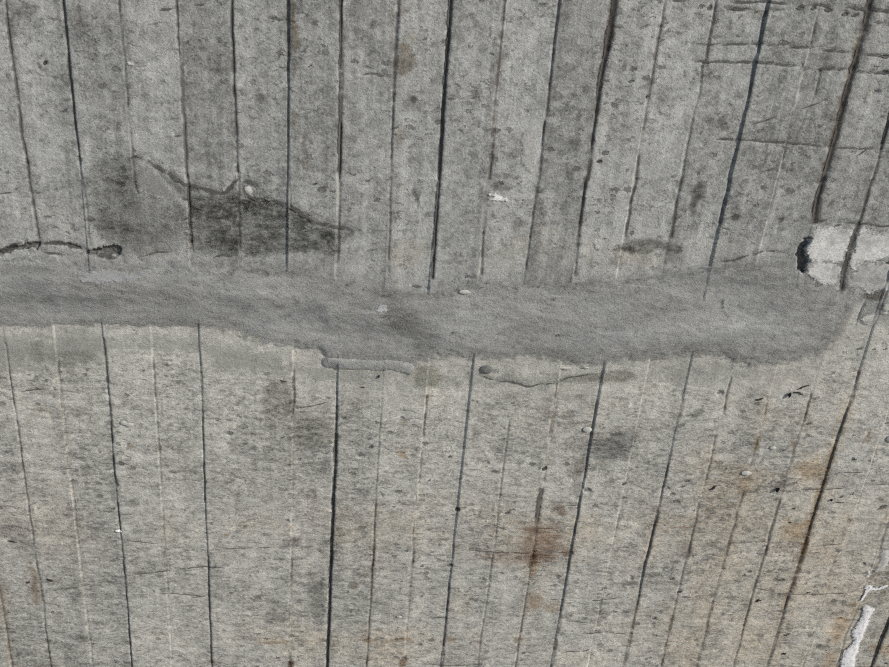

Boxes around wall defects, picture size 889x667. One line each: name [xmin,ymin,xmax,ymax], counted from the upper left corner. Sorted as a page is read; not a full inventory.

leakage [151,162,354,231]
crack [0,243,19,253]
crack [43,241,117,259]
peeling [806,226,889,294]
efflorescence [840,571,889,667]